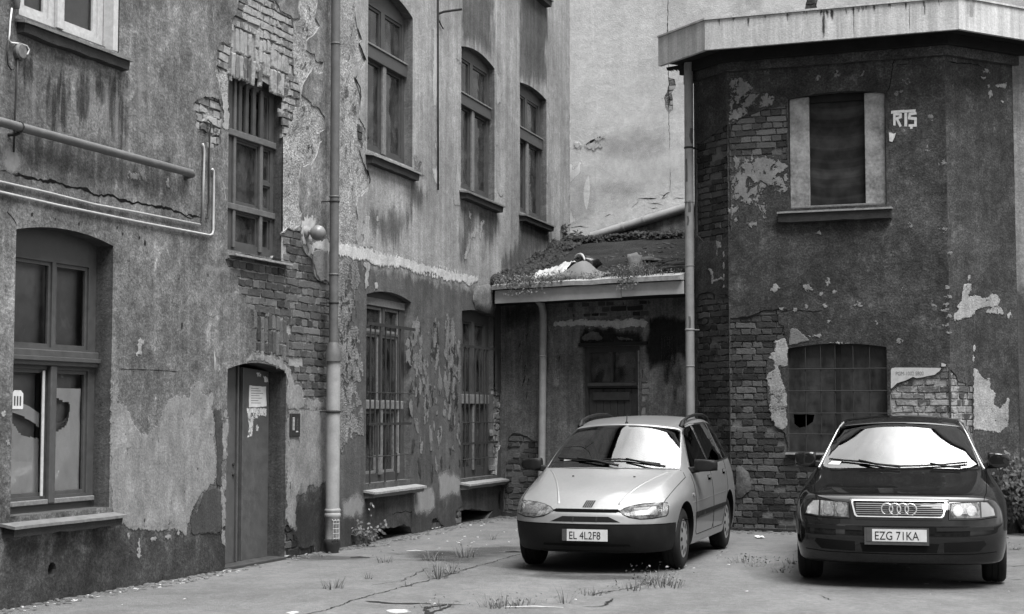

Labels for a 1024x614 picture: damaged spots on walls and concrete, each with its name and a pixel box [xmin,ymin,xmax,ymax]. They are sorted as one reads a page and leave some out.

leakage [48,77,123,141]
flaking render [193,96,223,148]
flaking render [217,0,313,166]
crack [1,170,201,219]
flaking render [686,77,836,529]
flaking render [931,275,1011,334]
flaking render [226,214,379,556]
peeling [405,311,463,529]
flaking render [489,389,538,513]
flaking render [890,345,1010,439]